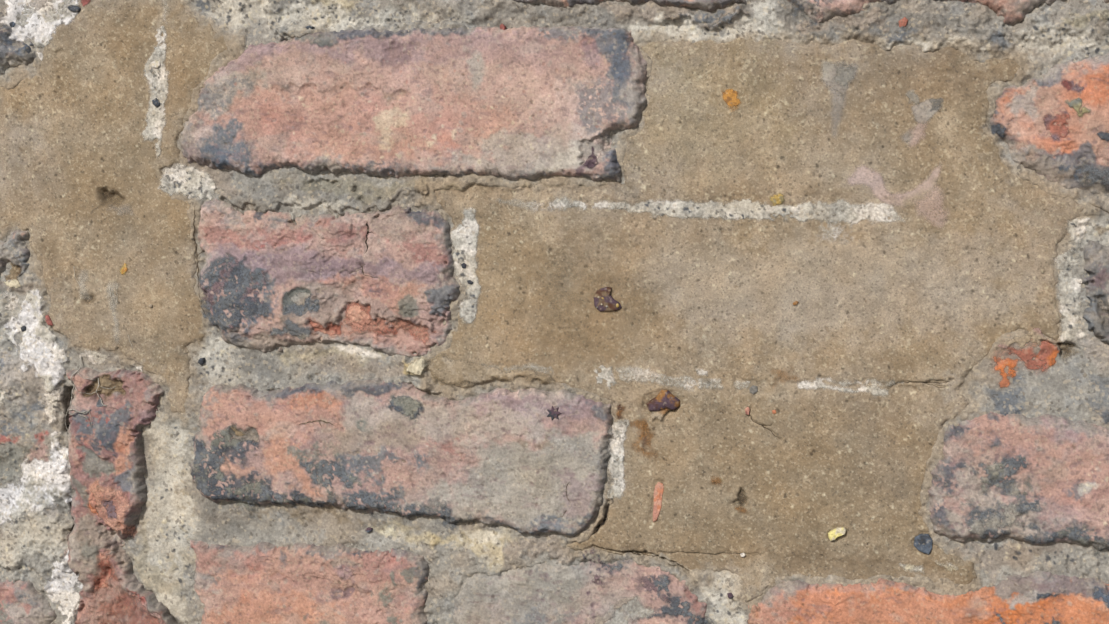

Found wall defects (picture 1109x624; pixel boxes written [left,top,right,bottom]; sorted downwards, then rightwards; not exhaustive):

crack [594,503,758,570]